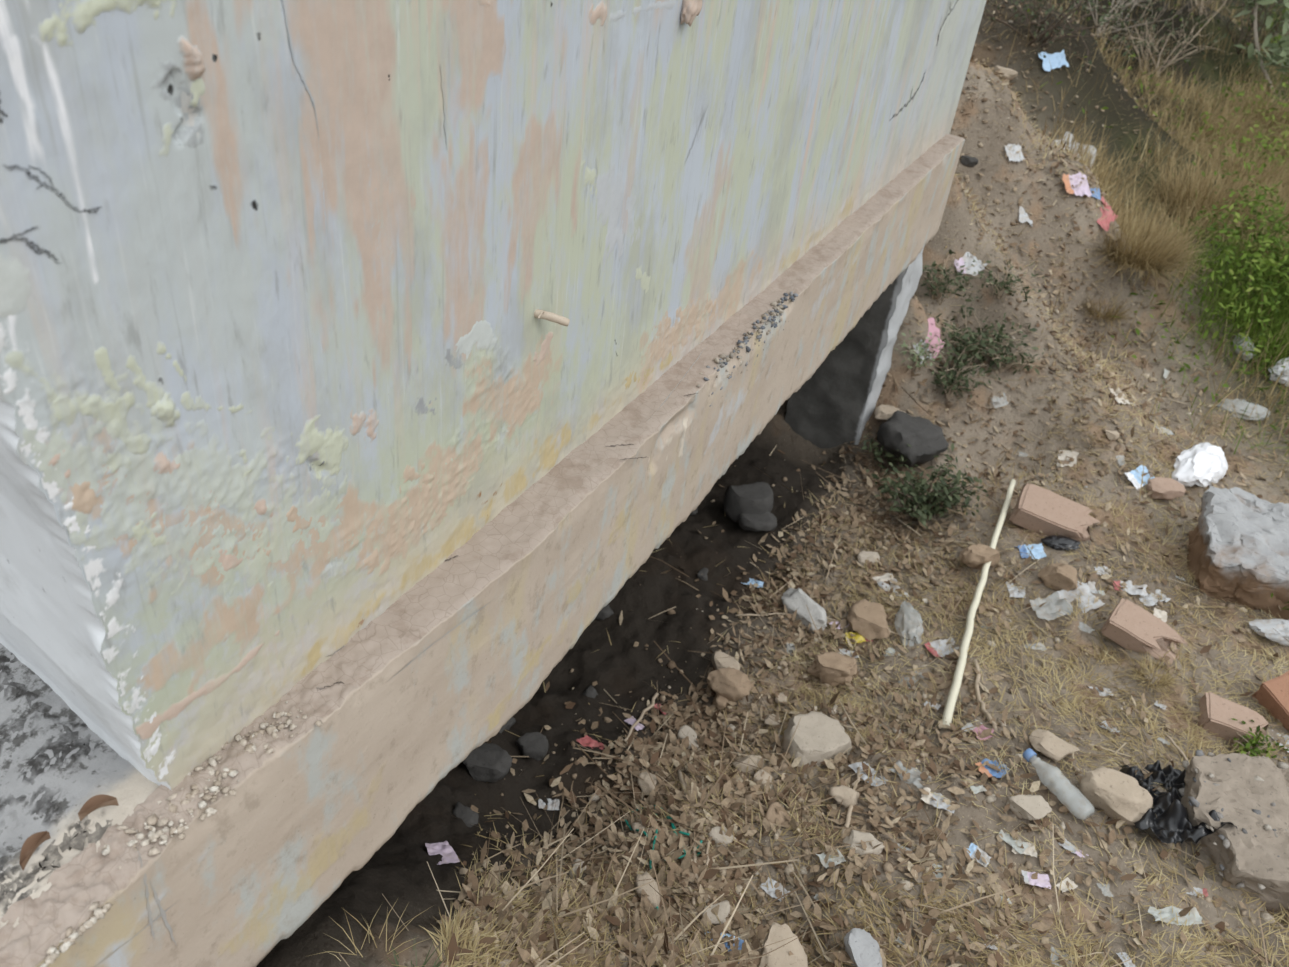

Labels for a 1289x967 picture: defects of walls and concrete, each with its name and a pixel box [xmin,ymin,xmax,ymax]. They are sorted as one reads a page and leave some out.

spalling [149,35,217,157]
crack [282,0,319,134]
crack [889,0,958,121]
spalling [665,291,798,461]
spalling [2,367,178,780]
spalling [116,701,323,856]